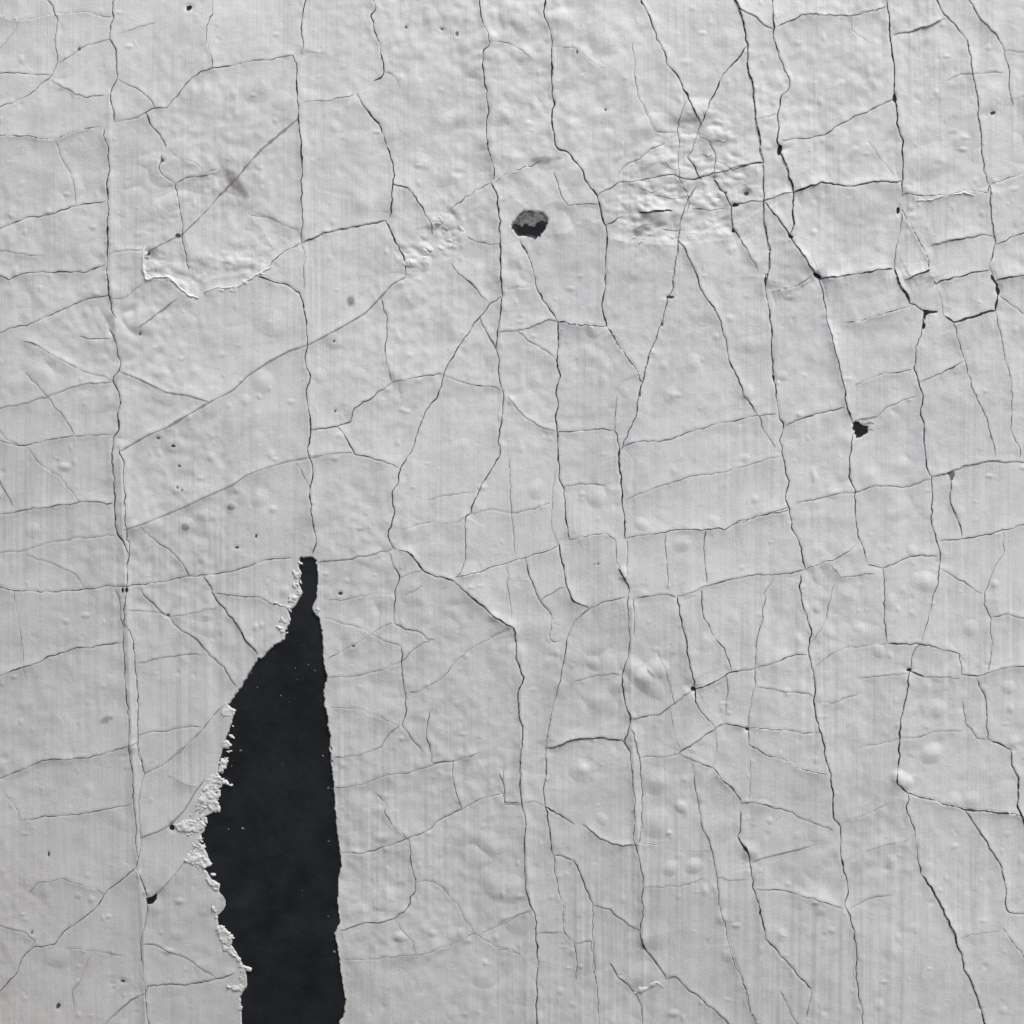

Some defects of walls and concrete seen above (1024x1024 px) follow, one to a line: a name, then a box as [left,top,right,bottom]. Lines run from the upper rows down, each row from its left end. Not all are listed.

crack [0,0,728,653]
spalling [511,210,548,239]
crack [641,0,1024,914]
spalling [852,416,877,438]
crack [0,661,232,991]
crack [0,572,236,686]
peeling [173,557,346,1024]
crack [330,413,658,915]
crack [541,760,729,1024]
crack [699,811,812,1024]
crack [771,843,861,1003]
crack [917,850,985,1024]